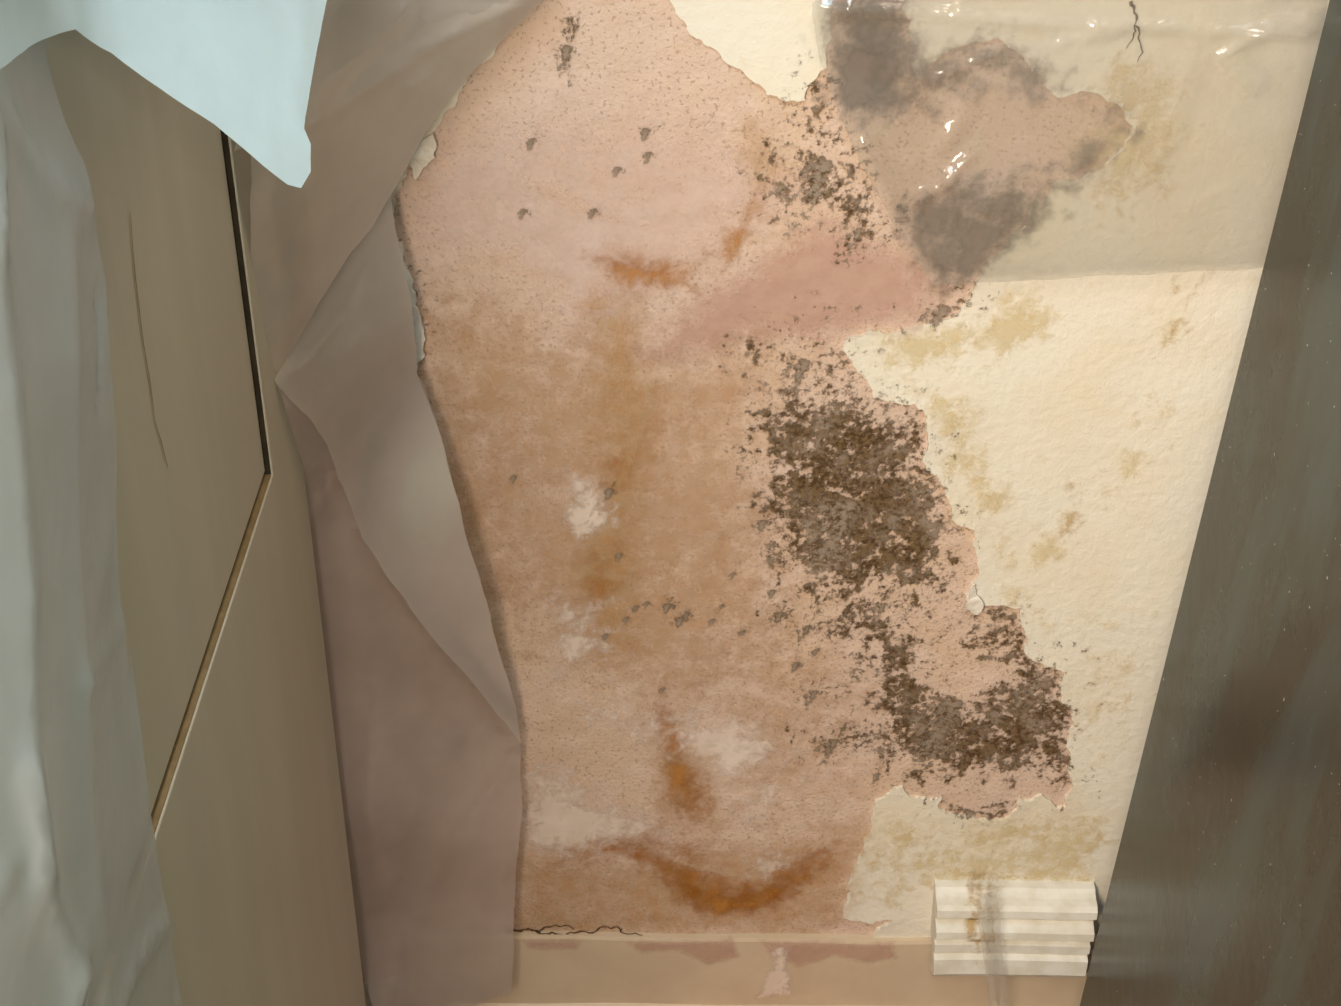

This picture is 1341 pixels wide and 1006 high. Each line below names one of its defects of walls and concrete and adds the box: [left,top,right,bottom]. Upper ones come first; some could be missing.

leakage [521,766,664,858]
flaking render [391,0,1131,935]
leakage [454,0,1100,832]
leakage [967,917,996,943]